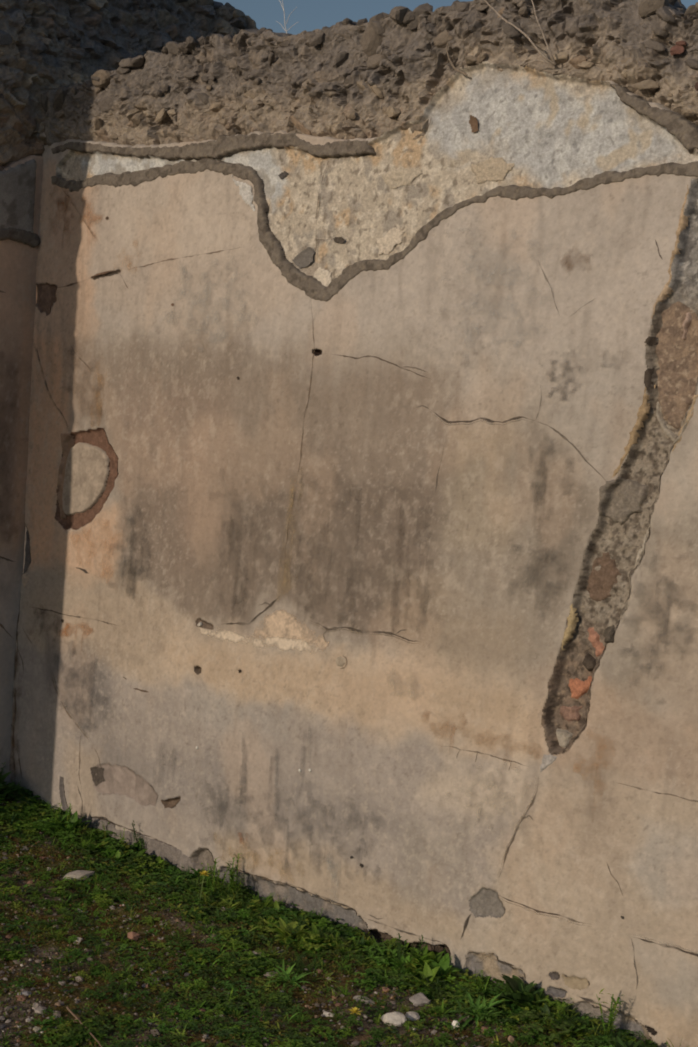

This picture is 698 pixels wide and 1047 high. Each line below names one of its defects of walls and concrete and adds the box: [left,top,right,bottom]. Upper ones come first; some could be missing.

peeling [55,150,200,181]
peeling [215,61,698,287]
crack [342,355,426,377]
spalling [54,428,118,530]
crack [419,405,606,481]
spalling [540,179,698,772]
crack [312,621,415,643]
crack [456,750,539,862]
peeling [209,865,380,943]
crack [499,895,582,923]
peeling [463,952,653,1045]
crack [631,936,698,988]